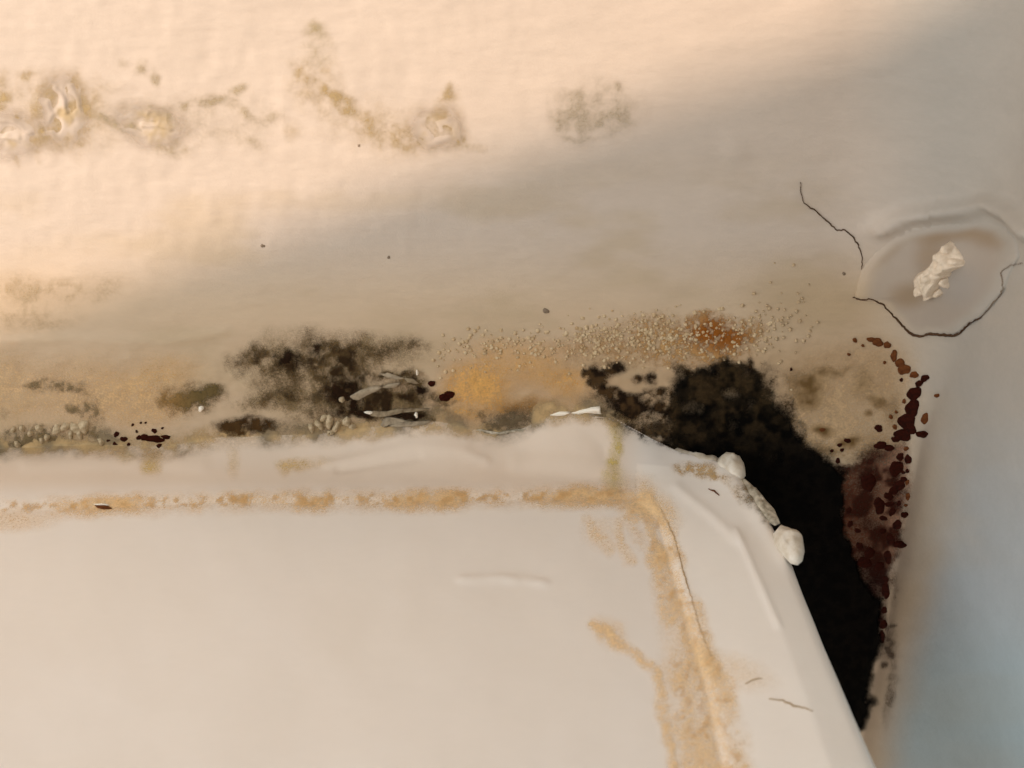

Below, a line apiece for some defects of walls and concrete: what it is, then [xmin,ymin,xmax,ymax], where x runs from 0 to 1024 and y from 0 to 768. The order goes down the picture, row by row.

damp [322,85,355,114]
crack [800,182,863,270]
crack [853,263,1023,338]
flaking render [308,414,357,436]
peeling [339,370,433,427]
damp [0,284,930,768]
rust [836,442,910,625]